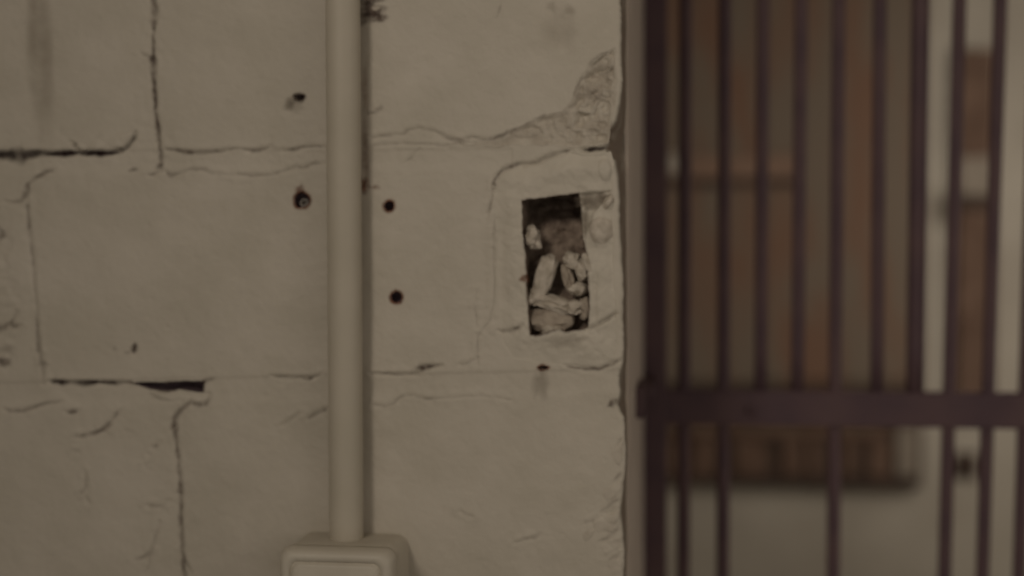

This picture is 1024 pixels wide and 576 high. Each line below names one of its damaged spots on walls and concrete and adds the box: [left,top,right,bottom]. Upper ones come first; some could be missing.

crack [151,27,160,132]
spalling [447,47,618,148]
crack [0,146,129,159]
spalling [521,193,606,336]
crack [52,378,116,386]